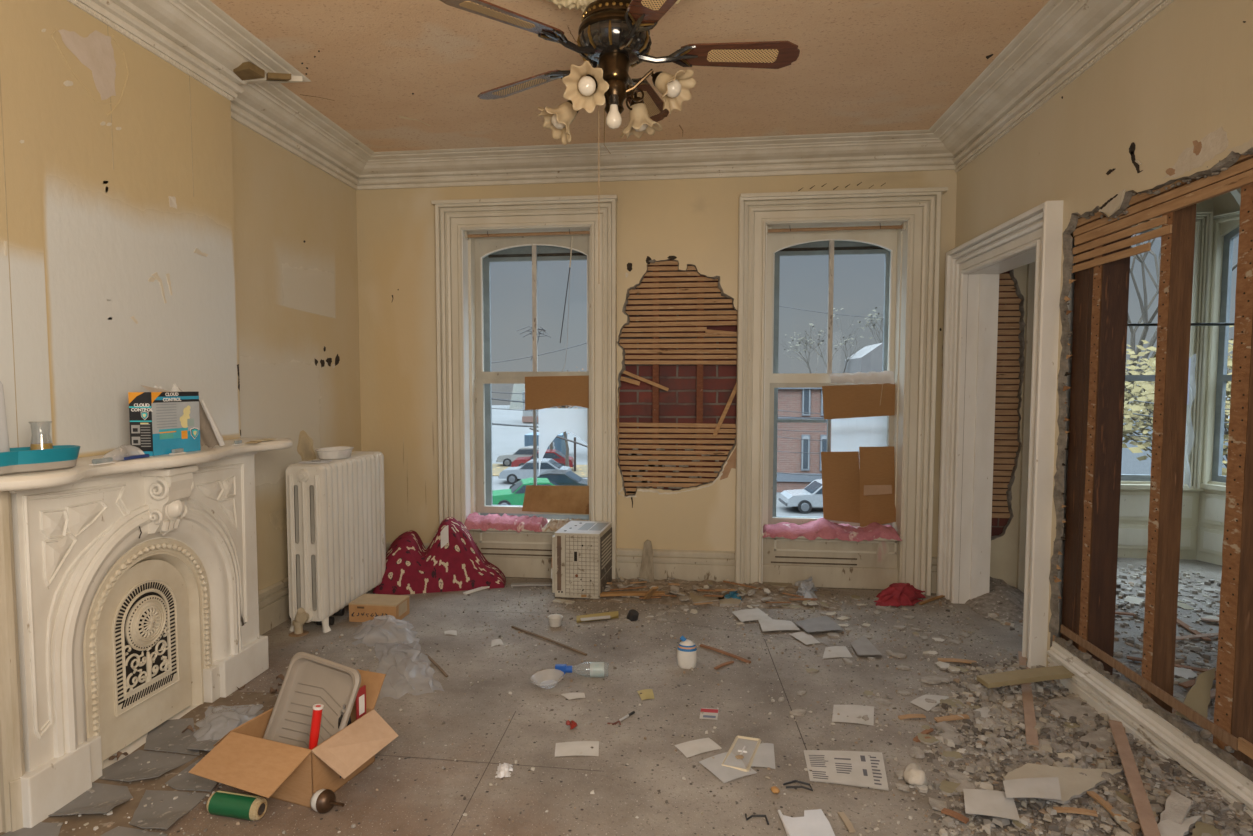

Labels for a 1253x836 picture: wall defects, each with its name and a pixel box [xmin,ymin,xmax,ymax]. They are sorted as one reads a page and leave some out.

flaking render [617,256,737,508]
flaking render [990,264,1027,587]
spalling [1049,127,1253,634]